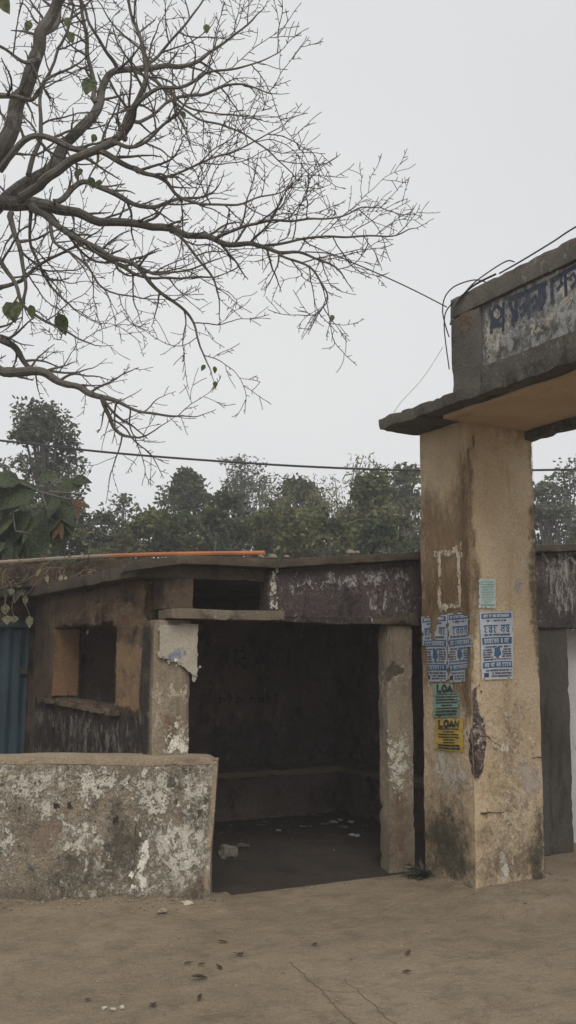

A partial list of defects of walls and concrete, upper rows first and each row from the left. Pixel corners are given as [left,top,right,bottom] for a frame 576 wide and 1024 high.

flaking render [269,568,283,609]
water stain [367,435,480,711]
peeling [163,721,189,755]
peeling [387,730,414,801]
spalling [433,683,544,871]
peeling [0,765,212,893]
water stain [428,795,545,884]